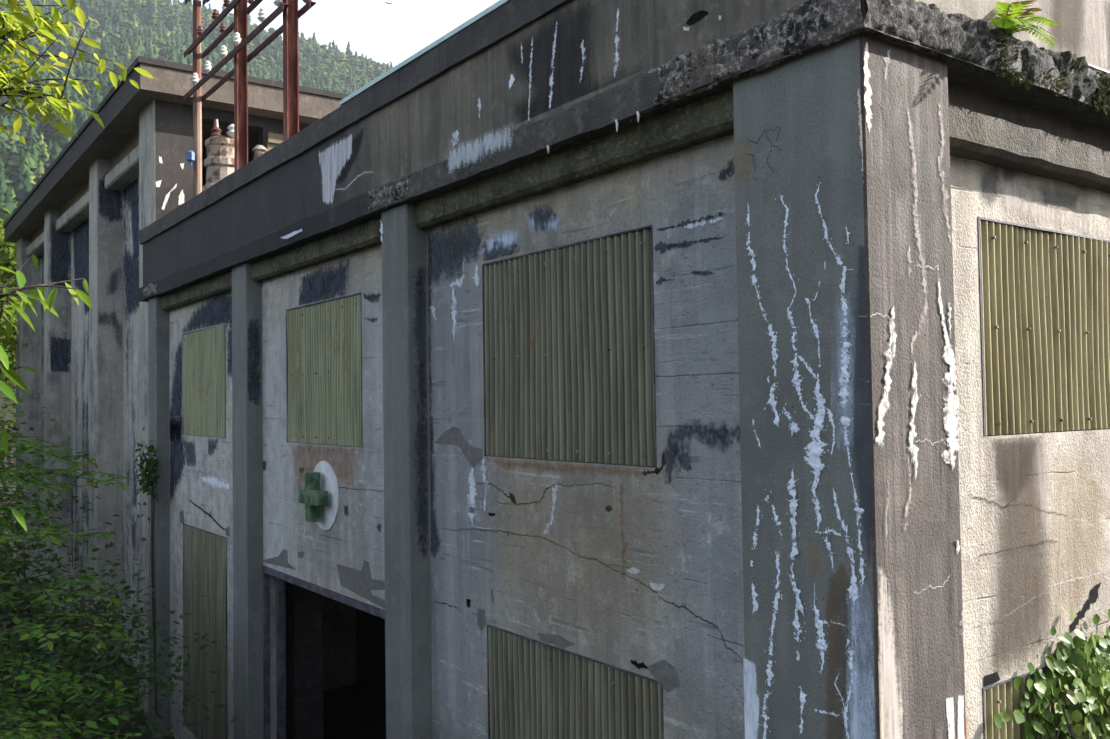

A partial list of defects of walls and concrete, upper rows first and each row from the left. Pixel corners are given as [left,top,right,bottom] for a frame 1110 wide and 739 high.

leakage [449,4,599,169]
leakage [613,9,624,82]
spalling [629,0,1110,171]
leakage [319,130,363,204]
crack [748,127,782,172]
leakage [654,212,723,253]
leakage [904,100,959,530]
crack [478,482,616,505]
leakage [664,418,761,484]
leakage [743,182,903,739]
crack [458,528,742,659]
crack [1005,509,1110,633]